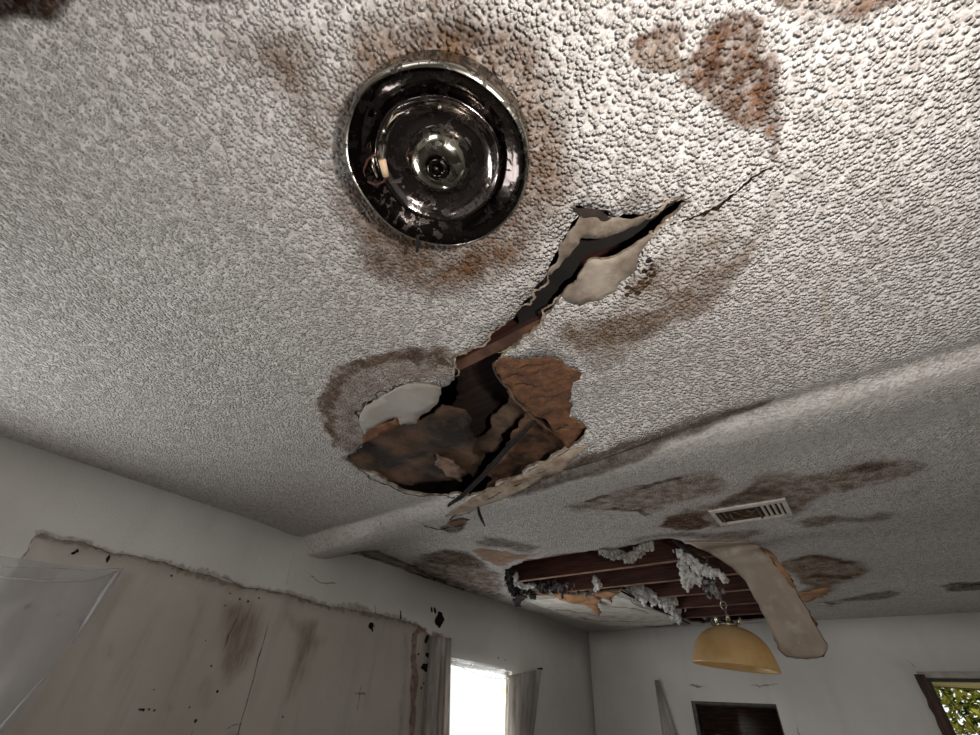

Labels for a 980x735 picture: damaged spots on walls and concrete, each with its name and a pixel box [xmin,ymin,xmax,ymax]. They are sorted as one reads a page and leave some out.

leakage [0,0,69,21]
leakage [358,25,535,81]
leakage [637,14,779,136]
leakage [350,91,562,286]
crack [516,165,776,341]
spalling [346,340,588,532]
leakage [574,477,717,516]
leakage [661,462,921,538]
peeling [0,534,445,735]
leakage [353,550,536,608]
peeling [528,595,676,626]
leakage [944,582,980,591]